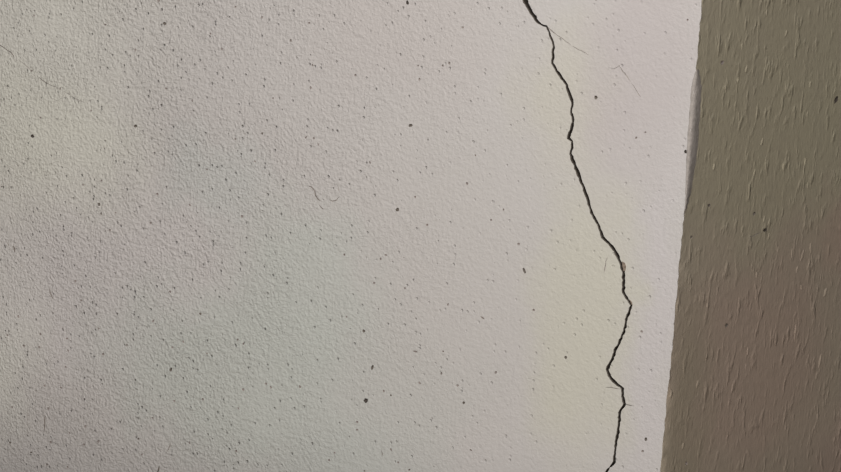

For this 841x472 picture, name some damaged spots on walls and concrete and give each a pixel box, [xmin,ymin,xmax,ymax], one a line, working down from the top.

crack [523,0,633,472]